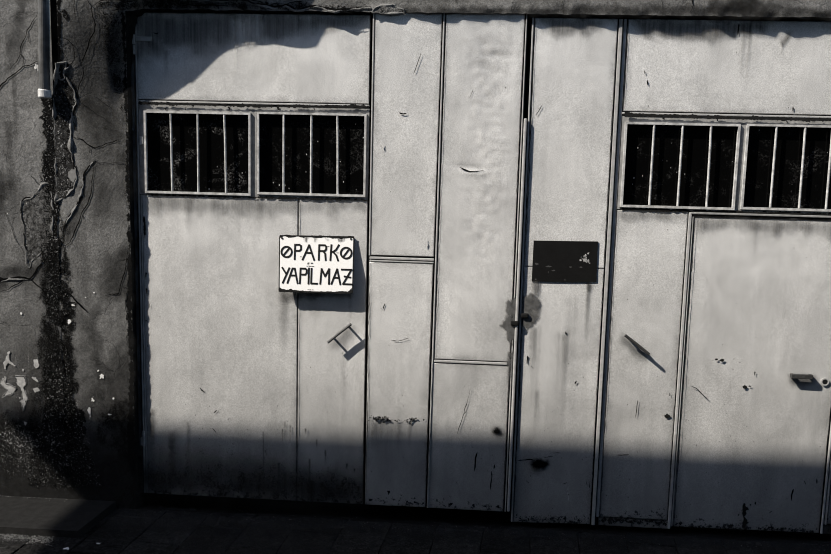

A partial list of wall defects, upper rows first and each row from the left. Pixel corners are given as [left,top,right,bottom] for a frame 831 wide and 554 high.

crack [0,15,37,87]
crack [181,0,371,13]
crack [59,0,124,247]
crack [0,176,46,294]
damp [0,152,80,439]
crack [105,250,131,322]
peeling [0,347,102,491]